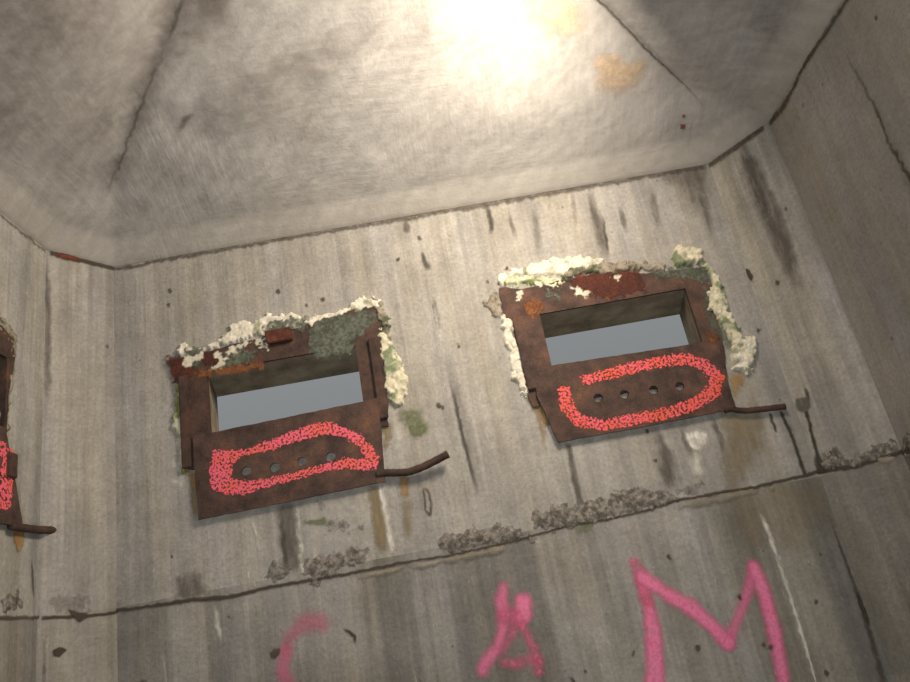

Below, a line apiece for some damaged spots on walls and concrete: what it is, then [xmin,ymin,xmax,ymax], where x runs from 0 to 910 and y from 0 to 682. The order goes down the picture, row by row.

crack [1,0,848,270]
crack [867,95,910,181]
spalling [818,433,910,470]
spalling [302,546,370,587]
rust [371,489,386,548]
crack [0,449,910,620]
spalling [438,486,696,554]